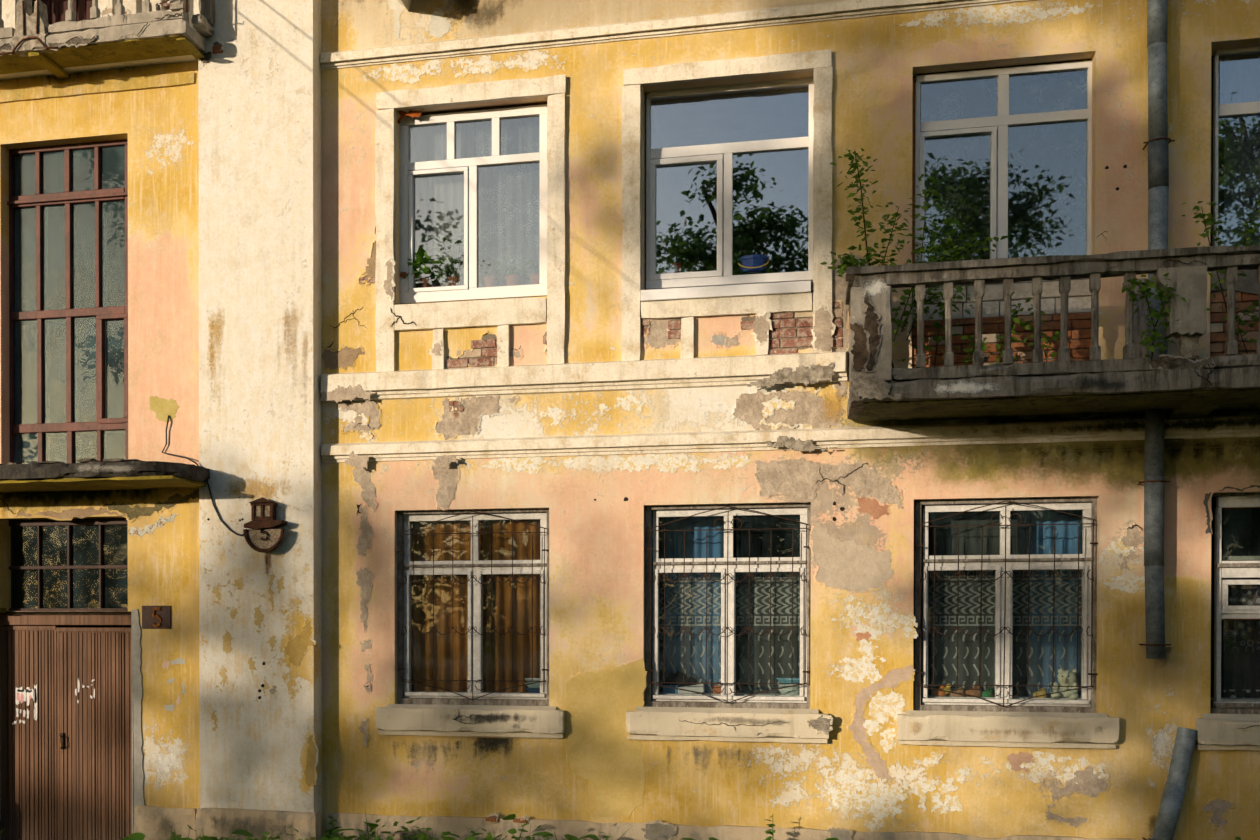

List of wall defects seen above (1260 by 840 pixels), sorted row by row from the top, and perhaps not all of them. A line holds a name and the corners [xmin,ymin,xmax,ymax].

damp [458,0,502,21]
flaking render [321,345,367,373]
crack [323,307,417,352]
flaking render [428,330,524,368]
flaking render [711,250,902,430]
flaking render [432,394,520,440]
peeling [532,406,567,426]
flaking render [614,453,905,519]
flaking render [807,522,966,840]
flaking render [1007,751,1111,829]
flaking render [641,820,677,840]